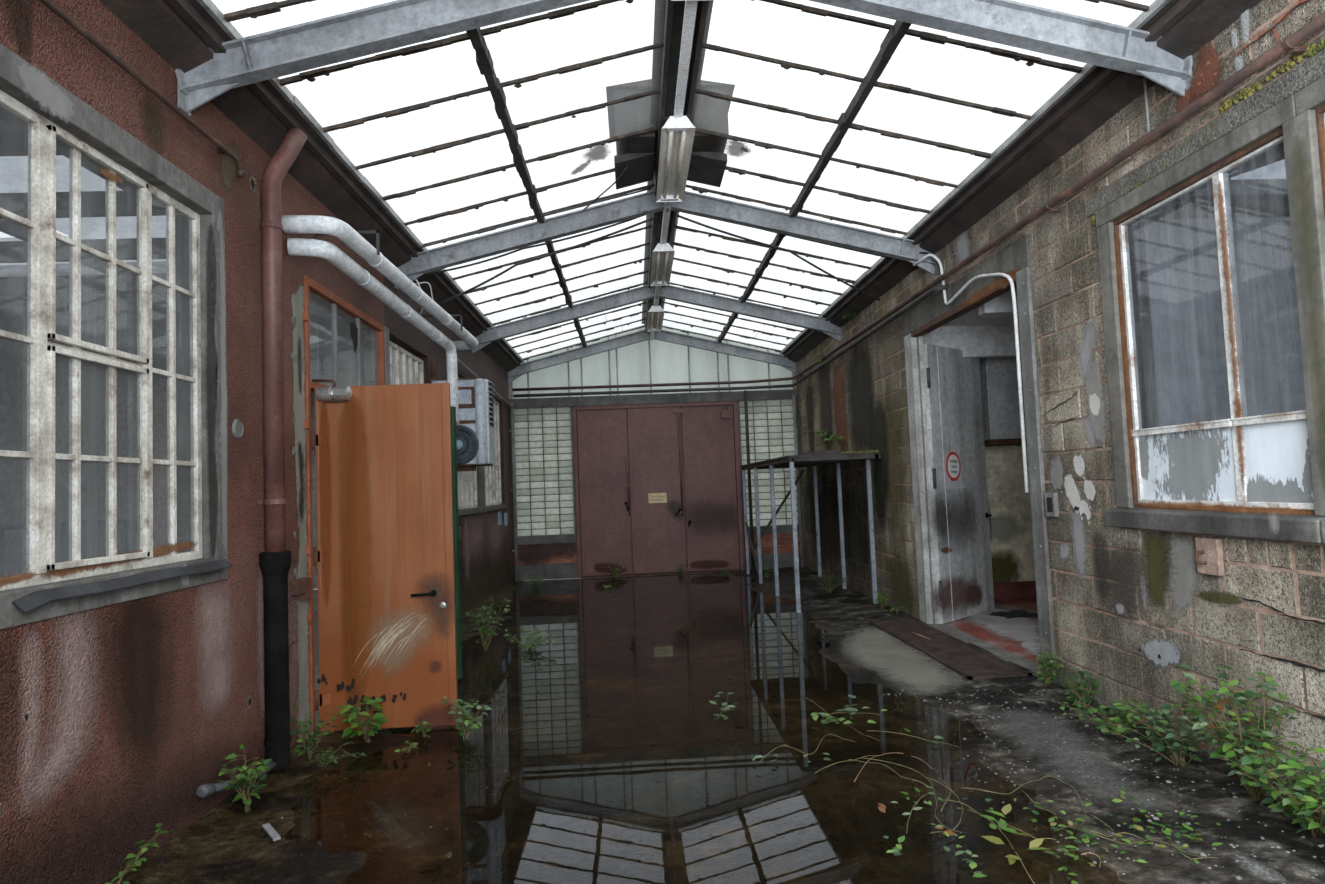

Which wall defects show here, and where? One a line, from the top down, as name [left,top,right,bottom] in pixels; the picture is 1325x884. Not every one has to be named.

leakage [1231,9,1249,71]
peeling [1089,393,1101,416]
peeling [1061,455,1096,525]
peeling [1138,410,1314,503]
leakage [1169,537,1240,610]
leakage [198,589,230,705]
leakage [21,614,93,795]
leakage [121,607,163,761]
leakage [1240,857,1280,880]